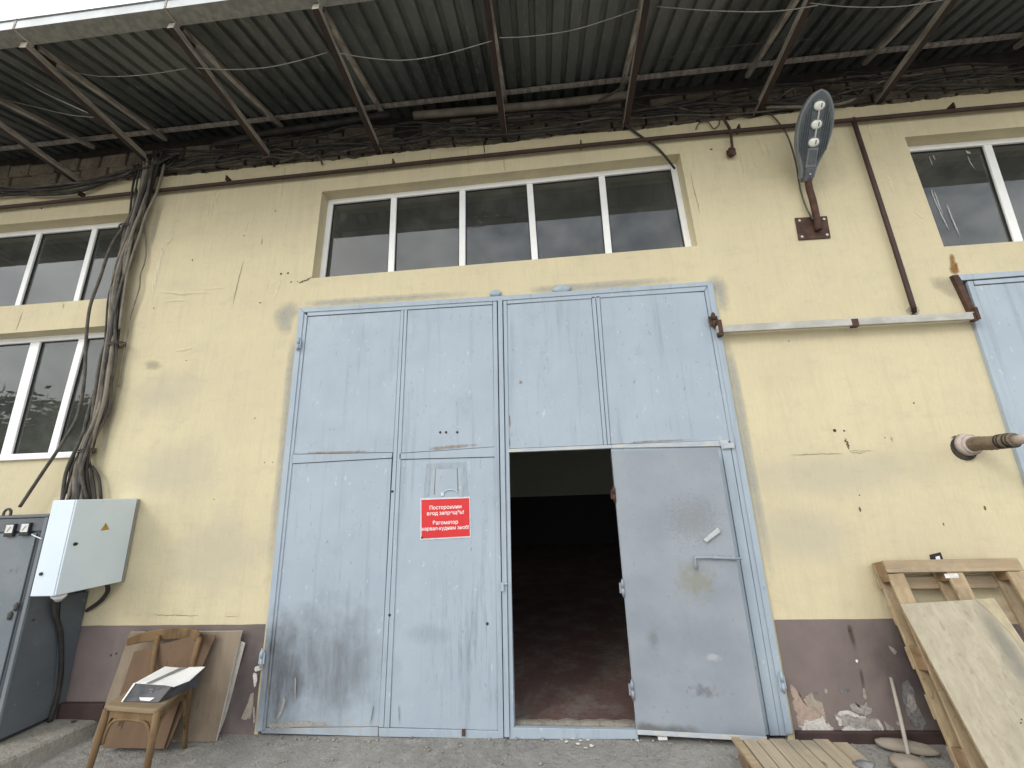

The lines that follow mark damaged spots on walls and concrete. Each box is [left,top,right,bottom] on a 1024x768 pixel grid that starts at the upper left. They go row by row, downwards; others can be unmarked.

crack [802,438,869,455]
peeling [241,666,262,723]
peeling [790,678,927,730]